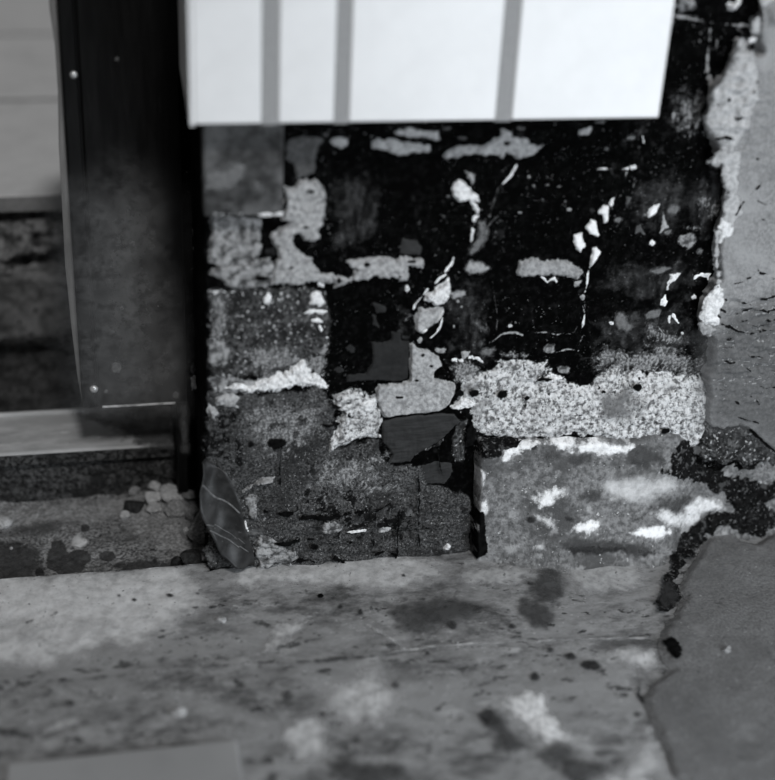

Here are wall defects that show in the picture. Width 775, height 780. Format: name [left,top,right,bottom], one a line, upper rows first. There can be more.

flaking render [285,135,348,179]
flaking render [372,127,451,156]
flaking render [443,126,543,159]
spalling [207,199,293,267]
peeling [447,172,488,254]
peeling [573,198,621,252]
peeling [635,204,671,246]
damp [678,227,703,253]
spalling [335,257,462,382]
peeling [646,267,681,324]
damp [450,351,483,382]
spalling [201,359,775,569]